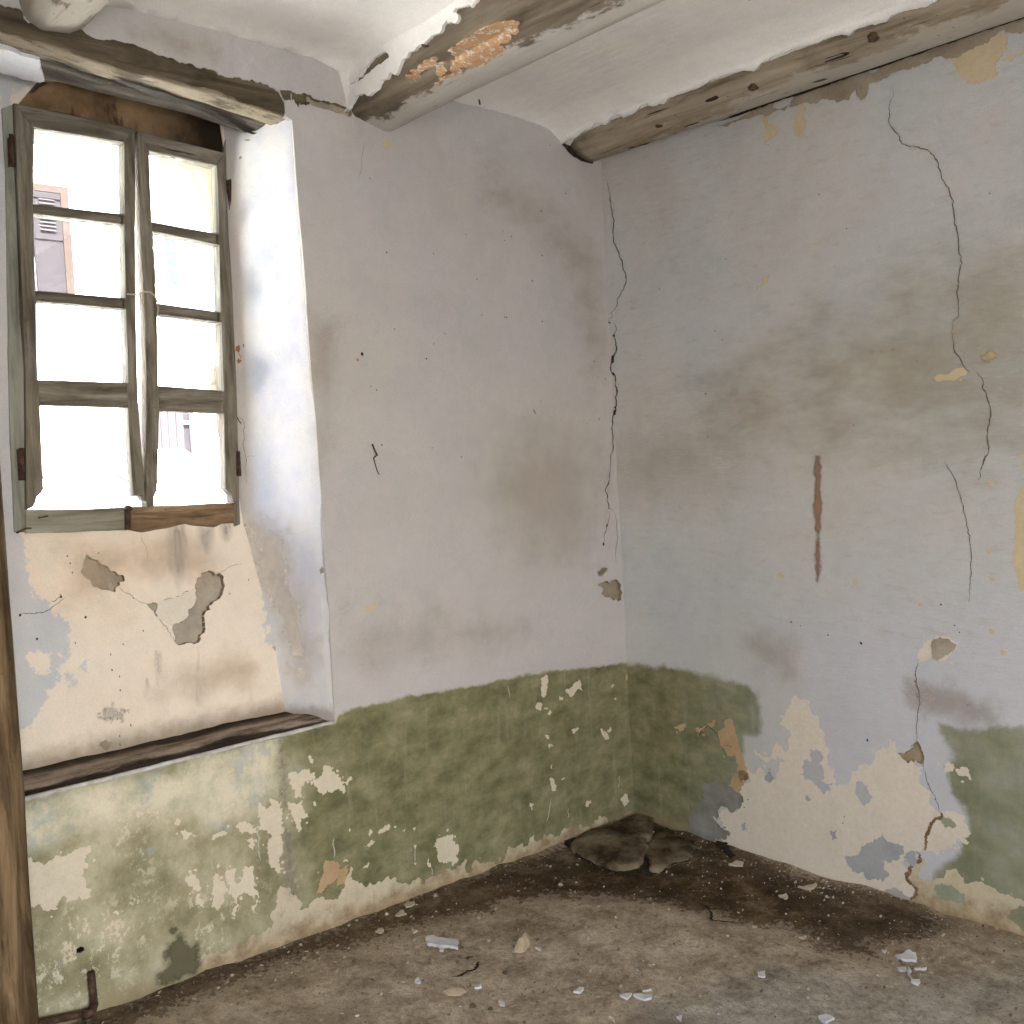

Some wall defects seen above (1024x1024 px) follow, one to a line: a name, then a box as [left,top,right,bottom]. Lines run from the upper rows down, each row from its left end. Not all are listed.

peeling [405,19,520,87]
spalling [718,18,1024,146]
crack [603,183,627,556]
crack [888,92,992,602]
rust [813,456,822,582]
flaking render [81,553,125,592]
flaking render [147,570,225,645]
flaking render [598,579,622,601]
crack [913,665,921,740]
peeling [674,695,1024,936]
peeling [28,845,96,918]
peeling [185,864,260,919]